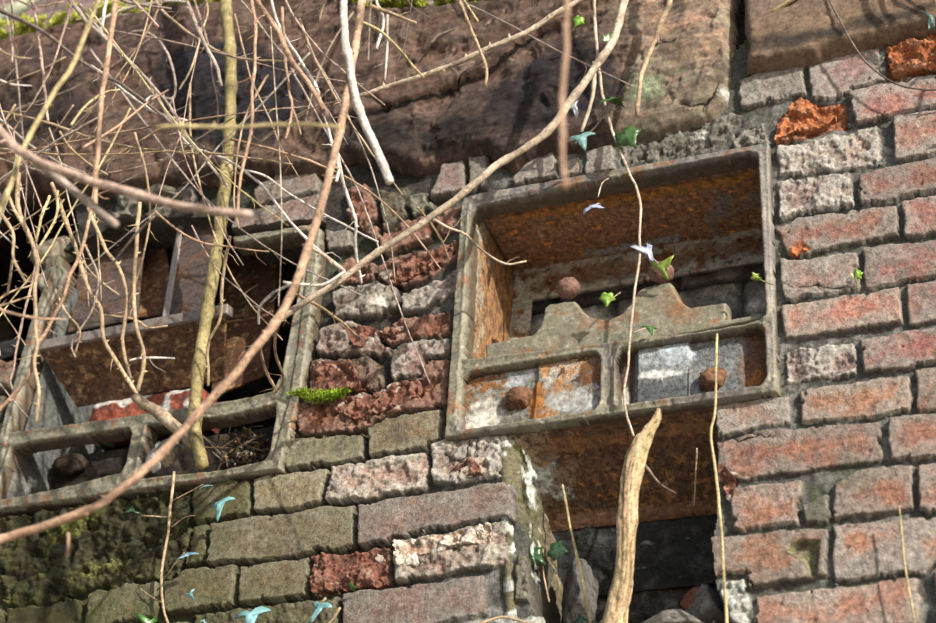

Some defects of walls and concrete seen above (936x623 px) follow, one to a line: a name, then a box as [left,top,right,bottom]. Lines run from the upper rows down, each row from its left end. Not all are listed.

spalling [886,34,936,80]
spalling [774,97,842,146]
rust [509,172,749,223]
rust [530,234,763,293]
spalling [342,325,405,350]
spalling [310,359,423,421]
rust [638,499,717,519]
water stain [8,485,198,623]
spalling [309,522,492,597]